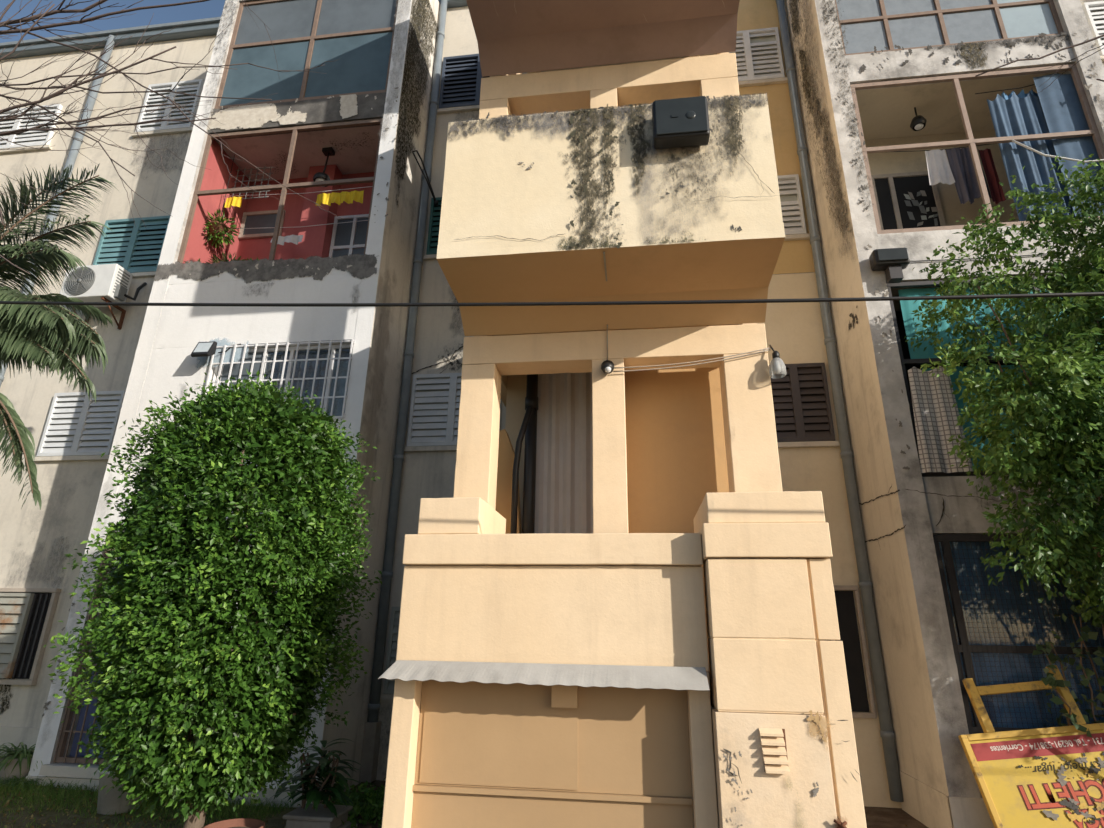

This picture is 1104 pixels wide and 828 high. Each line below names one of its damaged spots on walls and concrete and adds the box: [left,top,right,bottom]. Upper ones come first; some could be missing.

peeling [208,98,307,130]
peeling [328,94,377,119]
water stain [384,0,438,204]
water stain [789,0,853,253]
water stain [535,95,751,248]
crack [859,485,996,526]
crack [865,525,906,543]
crack [723,749,742,788]